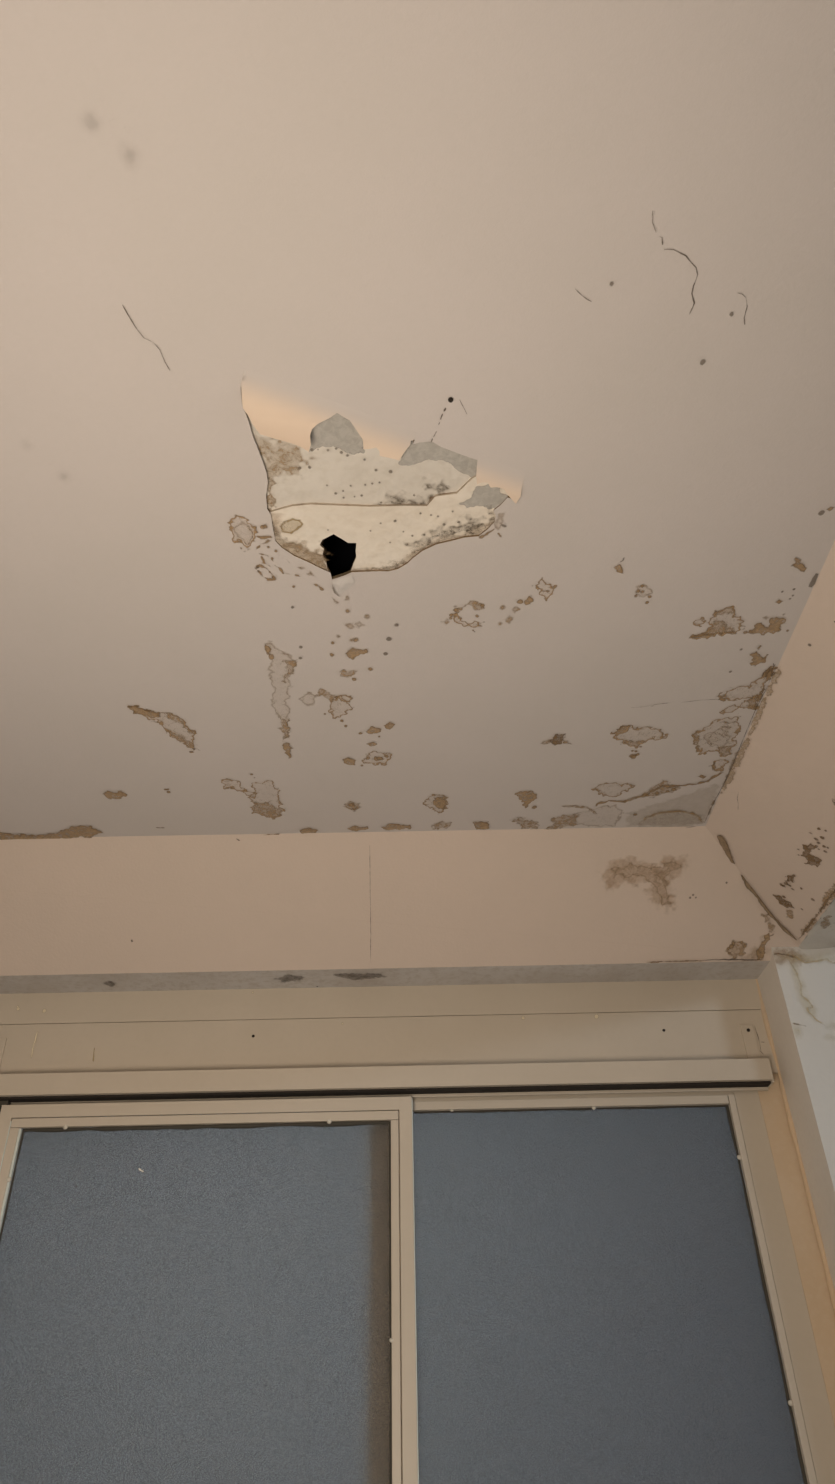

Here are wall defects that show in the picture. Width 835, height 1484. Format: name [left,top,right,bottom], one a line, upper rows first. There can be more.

peeling [257,525,355,603]
peeling [705,663,781,821]
peeling [0,825,102,840]
crack [717,835,835,940]
crack [650,957,754,965]